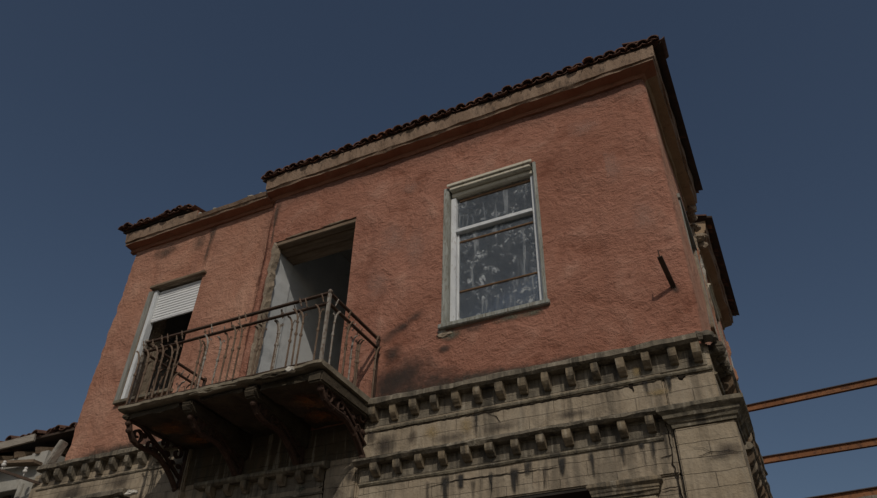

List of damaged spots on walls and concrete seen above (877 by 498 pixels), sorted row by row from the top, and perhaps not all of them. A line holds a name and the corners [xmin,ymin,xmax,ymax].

crack [662,424,684,498]
damp [442,474,475,498]
damp [511,462,531,491]